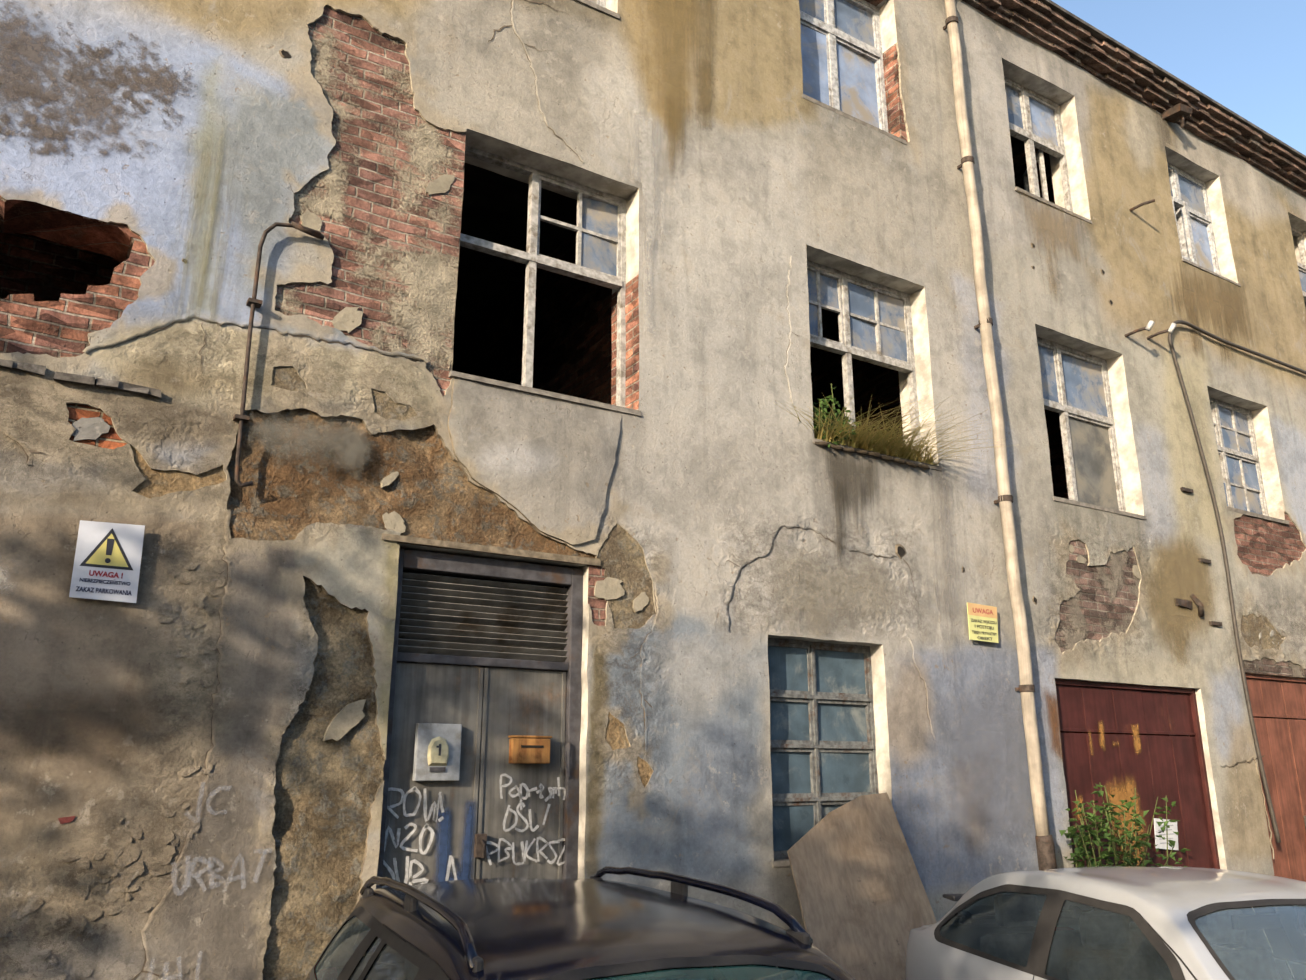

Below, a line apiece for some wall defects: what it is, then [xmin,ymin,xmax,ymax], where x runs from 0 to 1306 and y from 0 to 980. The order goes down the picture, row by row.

peeling [0,2,190,157]
crack [488,0,584,163]
flaking render [271,4,466,397]
flaking render [0,211,155,358]
crack [784,256,798,405]
spalling [66,388,656,629]
crack [717,523,936,739]
spalling [1055,539,1142,655]
flaking render [1234,511,1306,577]
crack [132,510,233,980]
spalling [262,576,386,980]
spalling [605,711,653,787]